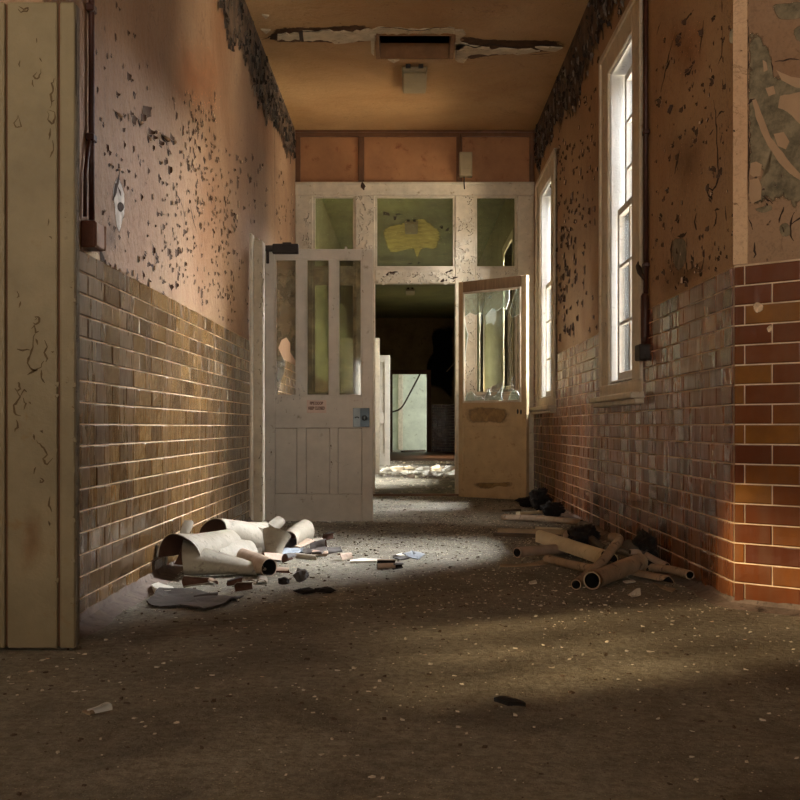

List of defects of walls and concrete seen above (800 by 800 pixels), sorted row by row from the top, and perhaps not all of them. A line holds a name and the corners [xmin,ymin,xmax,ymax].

crack [18,38,56,157]
peeling [86,89,311,322]
spalling [218,0,624,342]
spalling [651,187,728,291]
peeling [655,18,730,170]
spalling [748,33,800,213]
crack [13,292,54,526]